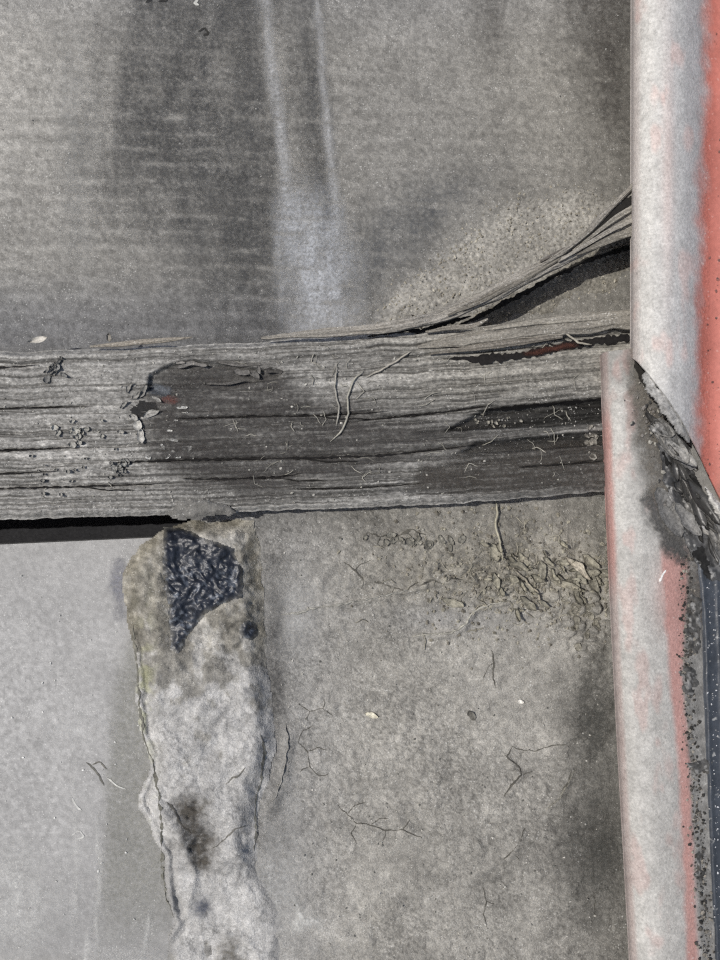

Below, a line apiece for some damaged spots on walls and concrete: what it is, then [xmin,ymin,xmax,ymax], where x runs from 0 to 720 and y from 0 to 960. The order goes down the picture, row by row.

damp [168,5,225,247]
damp [301,225,339,322]
crack [344,529,464,592]
crack [483,652,496,687]
crack [298,701,330,776]
crack [504,744,566,797]
crack [340,802,422,844]